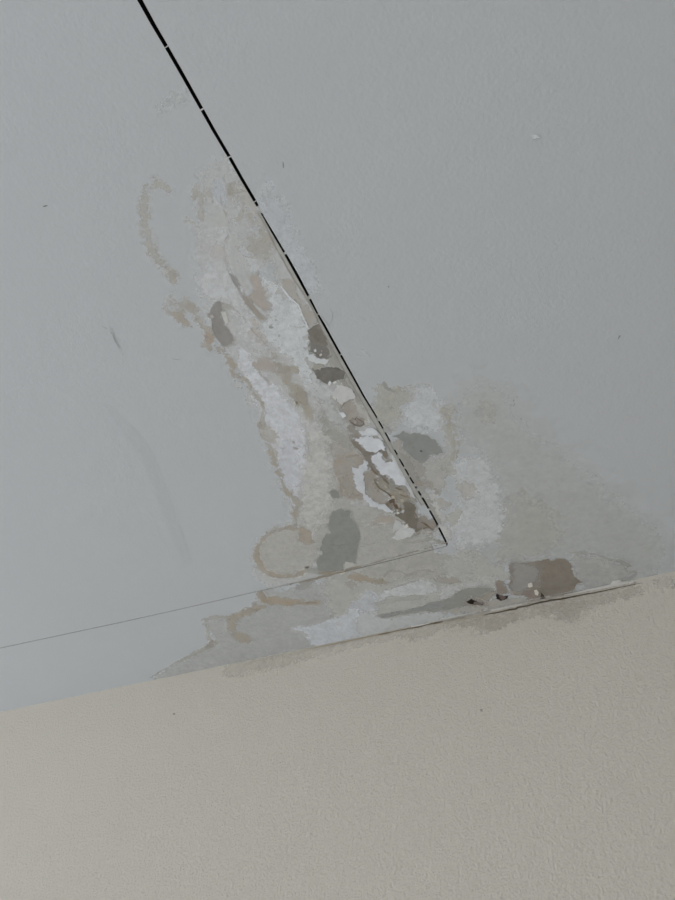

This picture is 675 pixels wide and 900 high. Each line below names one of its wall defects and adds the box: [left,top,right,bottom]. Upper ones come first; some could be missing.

spalling [207,301,235,347]
spalling [230,272,280,344]
spalling [303,323,444,541]
damp [154,166,640,680]
spalling [305,489,360,575]
spalling [291,557,584,646]